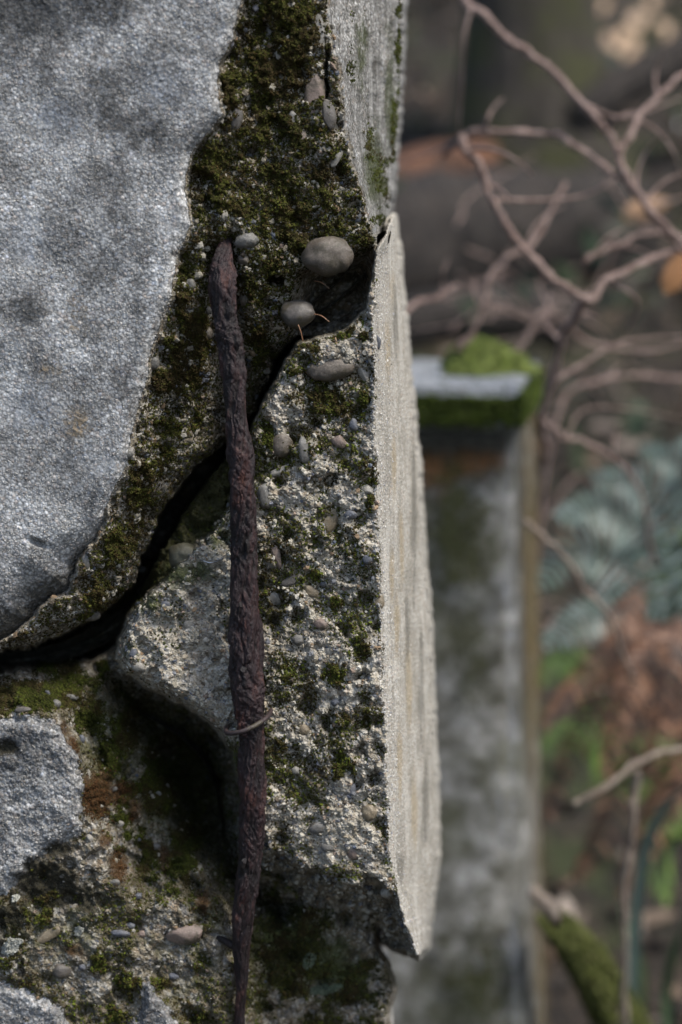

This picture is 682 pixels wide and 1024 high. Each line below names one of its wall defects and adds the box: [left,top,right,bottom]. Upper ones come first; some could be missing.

crack [0,533,172,665]
spalling [0,0,419,1024]
rust [207,237,267,1024]
crack [247,266,365,428]